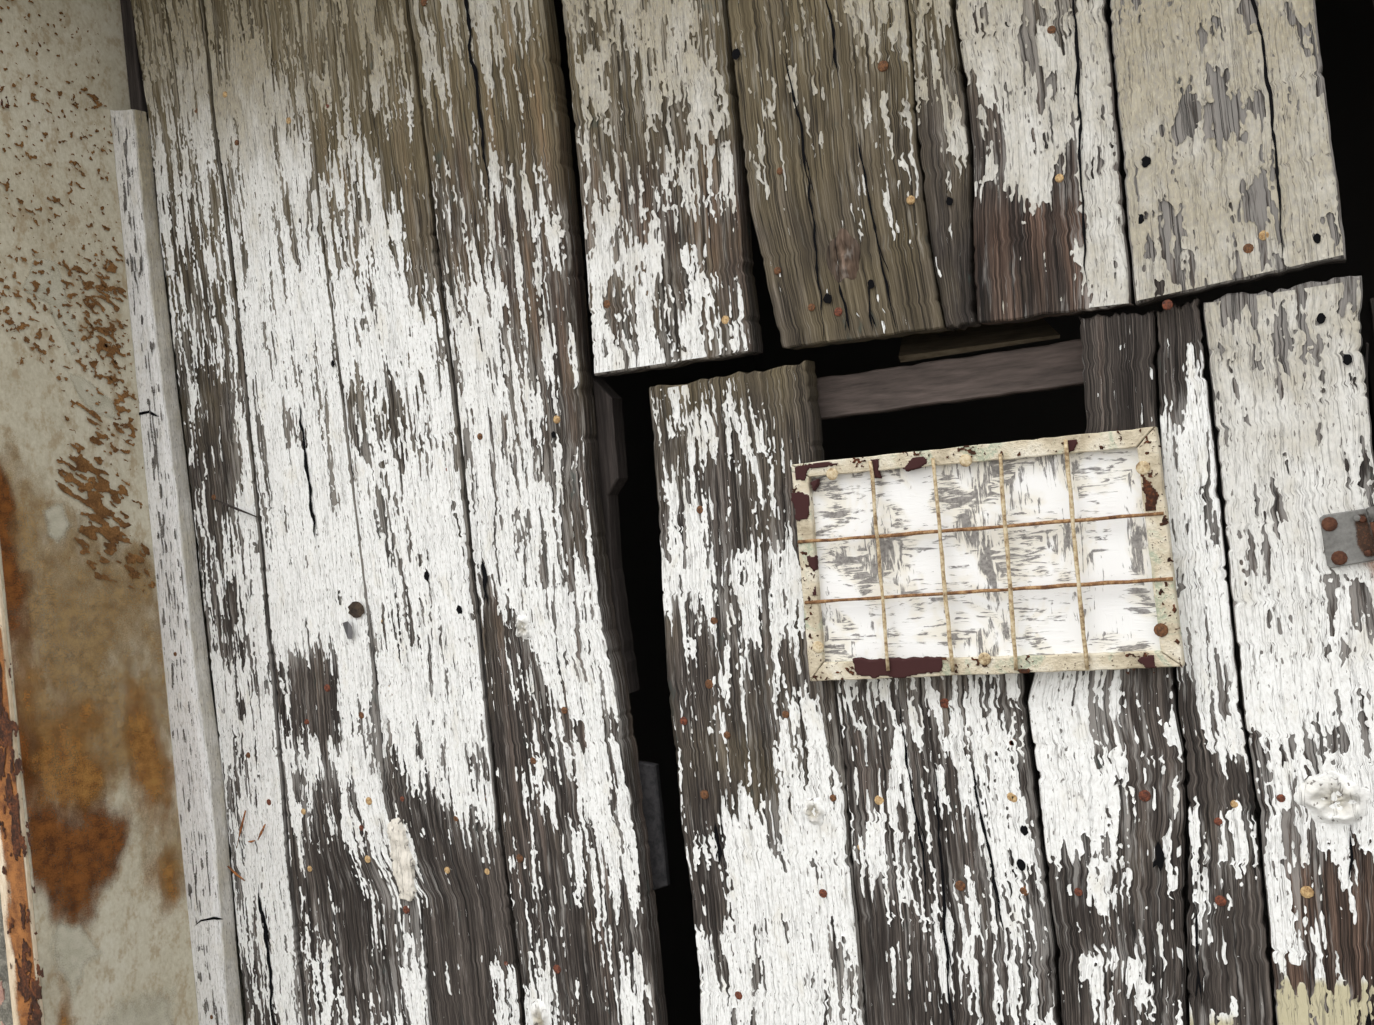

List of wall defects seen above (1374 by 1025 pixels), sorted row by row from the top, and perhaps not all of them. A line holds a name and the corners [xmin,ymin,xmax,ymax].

peeling [735,0,1343,308]
crack [1251,0,1283,256]
corrosion [0,0,175,1025]
peeling [133,0,750,1025]
corrosion [790,457,882,521]
corrosion [902,451,929,472]
corrosion [1055,439,1078,453]
corrosion [1099,428,1169,536]
corrosion [797,543,1034,680]
peeling [651,280,1374,1025]
corrosion [1112,652,1157,674]
corrosion [1159,582,1183,668]